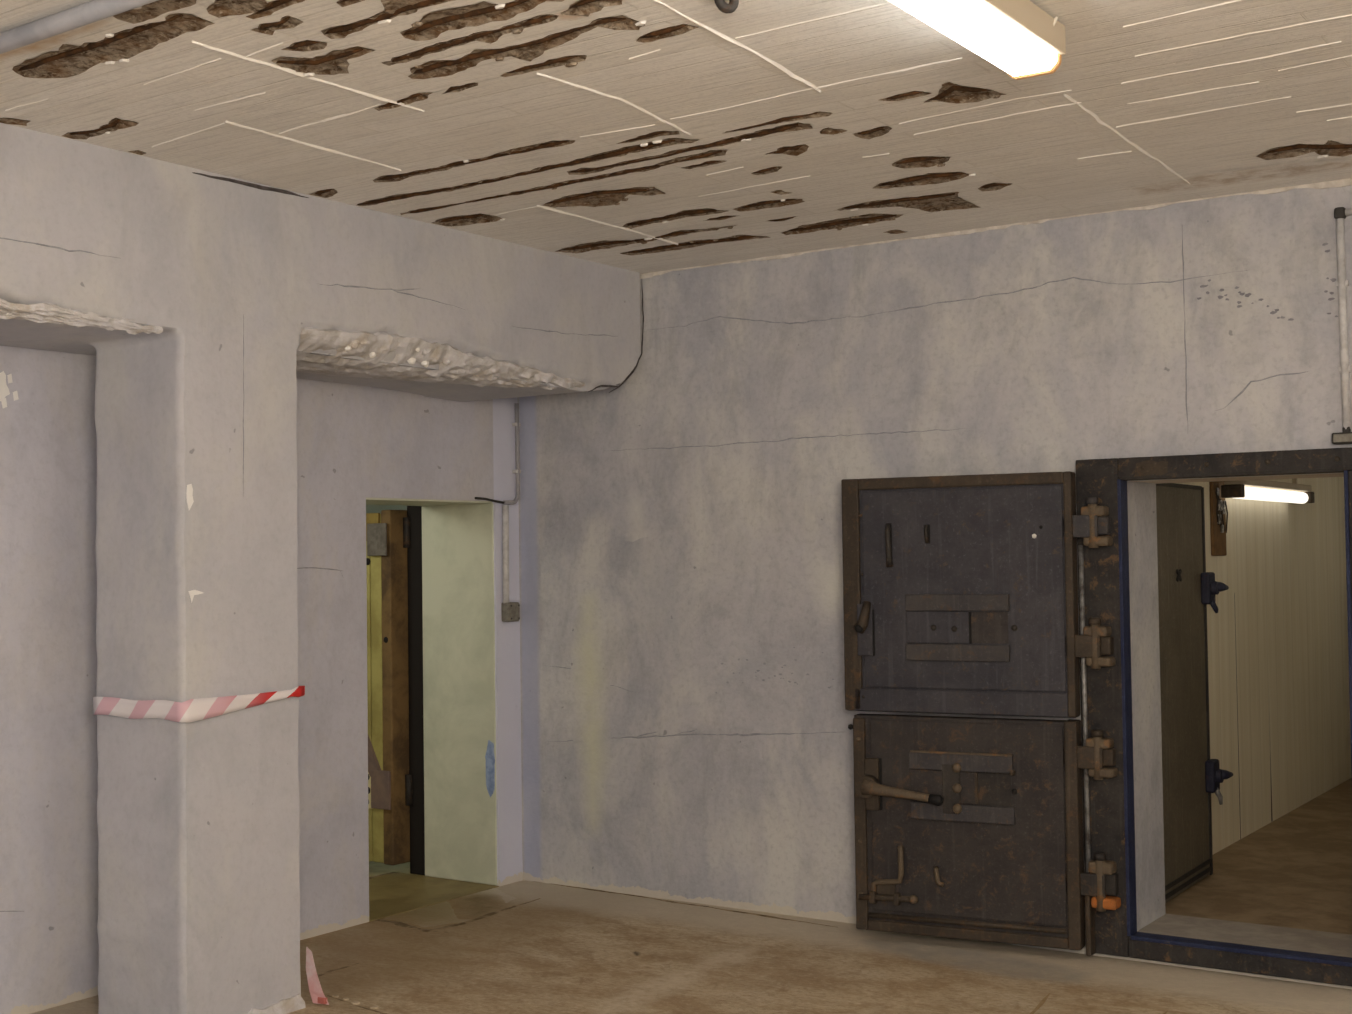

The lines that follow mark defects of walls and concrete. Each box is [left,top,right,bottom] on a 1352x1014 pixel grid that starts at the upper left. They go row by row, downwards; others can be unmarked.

spalling [12,0,698,111]
spalling [0,118,30,126]
spalling [63,118,138,139]
spalling [356,112,892,226]
peeling [555,140,1352,279]
crack [0,237,117,258]
spalling [0,298,163,334]
crack [513,228,1308,424]
spalling [296,327,585,390]
peeling [0,371,19,408]
crack [318,963,387,1014]